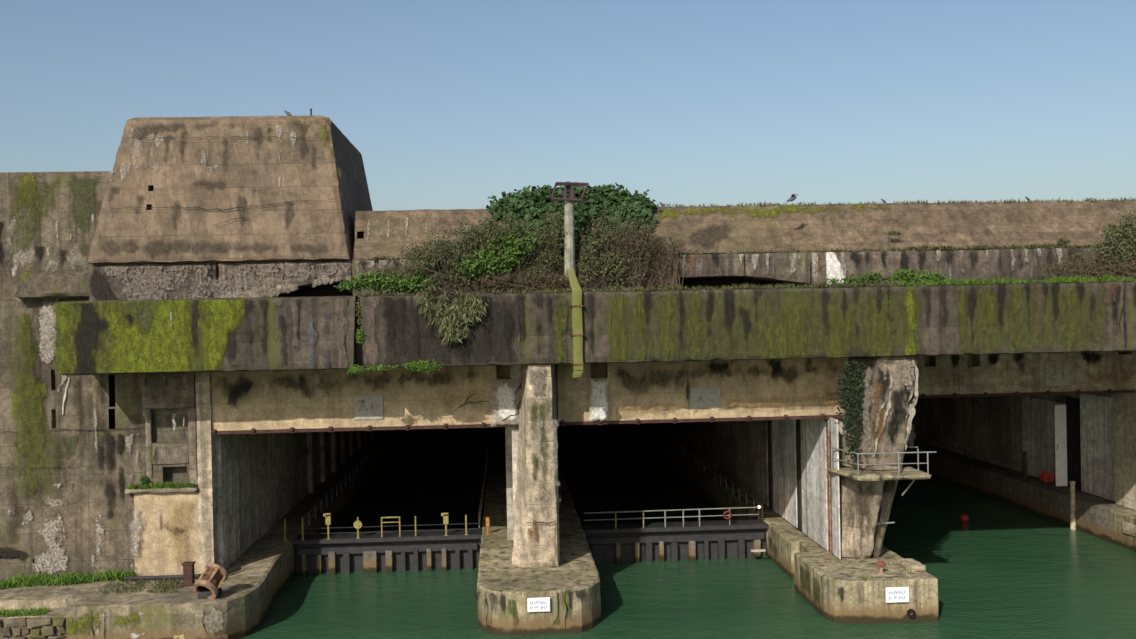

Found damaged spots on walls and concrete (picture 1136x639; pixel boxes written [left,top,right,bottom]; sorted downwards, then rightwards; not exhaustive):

leakage [109,125,186,196]
leakage [246,122,316,167]
leakage [216,293,562,406]
leakage [608,289,817,414]
leakage [822,287,896,371]
crack [1119,284,1127,347]
leakage [878,370,916,447]